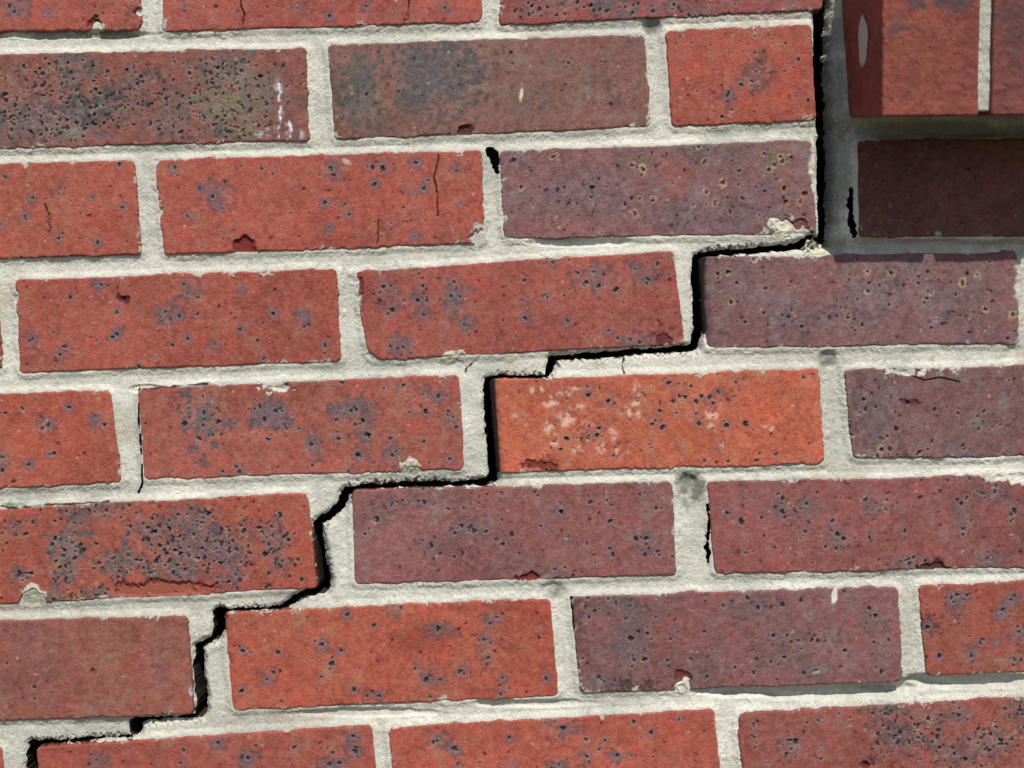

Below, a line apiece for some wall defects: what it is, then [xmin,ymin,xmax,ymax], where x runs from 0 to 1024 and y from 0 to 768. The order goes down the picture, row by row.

crack [1,500,109,509]
crack [26,0,826,768]